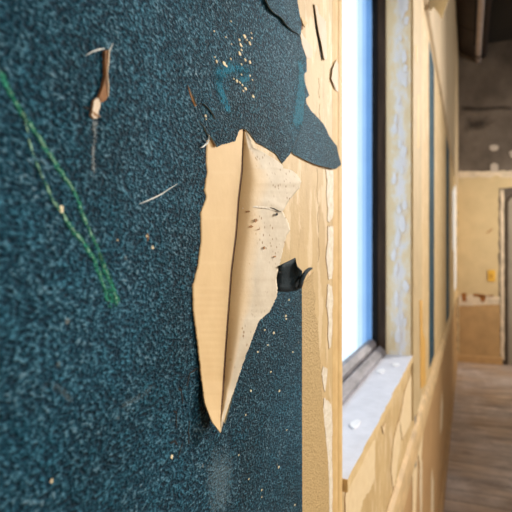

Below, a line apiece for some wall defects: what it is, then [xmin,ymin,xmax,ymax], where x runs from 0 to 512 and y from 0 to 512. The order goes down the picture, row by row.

peeling [265,0,313,58]
peeling [313,4,327,61]
peeling [192,129,313,433]
peeling [292,101,341,349]